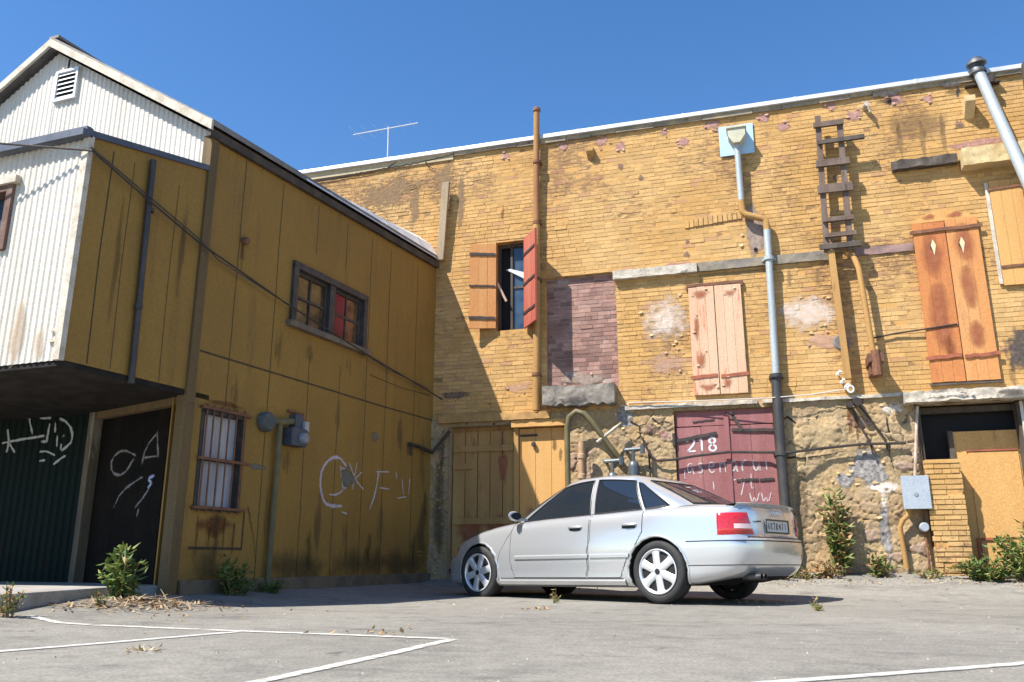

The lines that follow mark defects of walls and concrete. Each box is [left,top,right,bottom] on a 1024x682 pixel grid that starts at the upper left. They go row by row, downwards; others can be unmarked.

peeling [639,293,689,373]
peeling [781,295,852,348]
water stain [868,482,898,511]